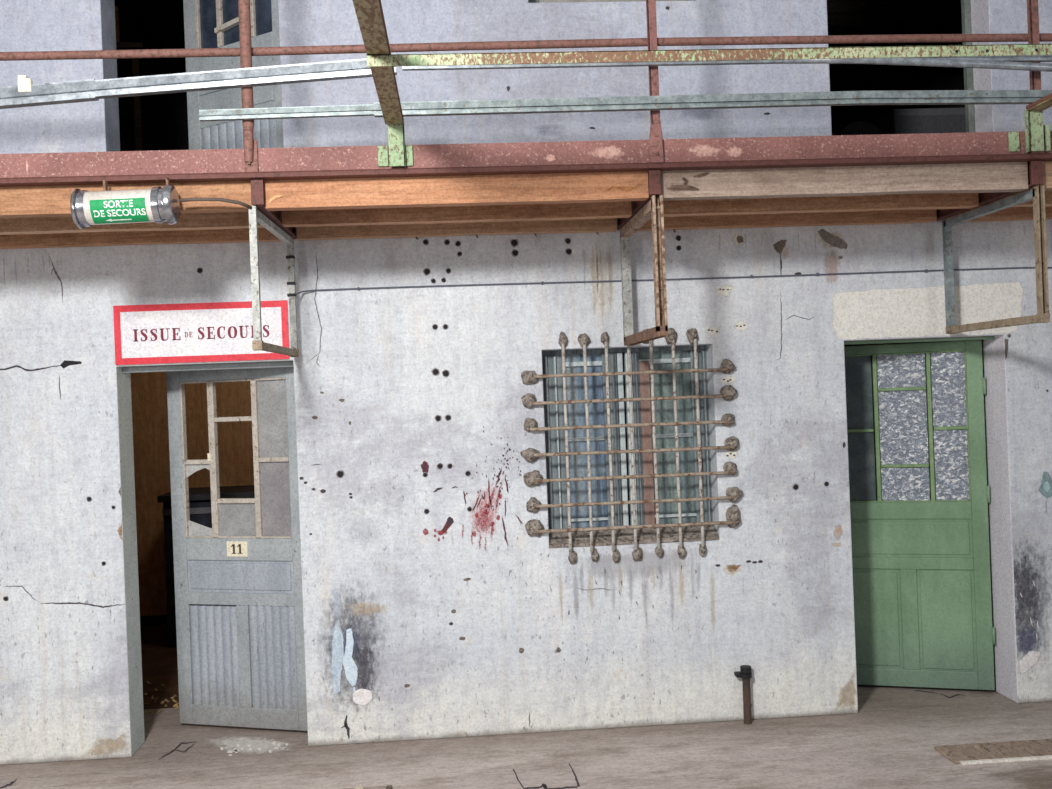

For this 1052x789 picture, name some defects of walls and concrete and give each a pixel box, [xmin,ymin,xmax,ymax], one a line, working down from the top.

crack [0,360,82,399]
crack [6,586,124,608]